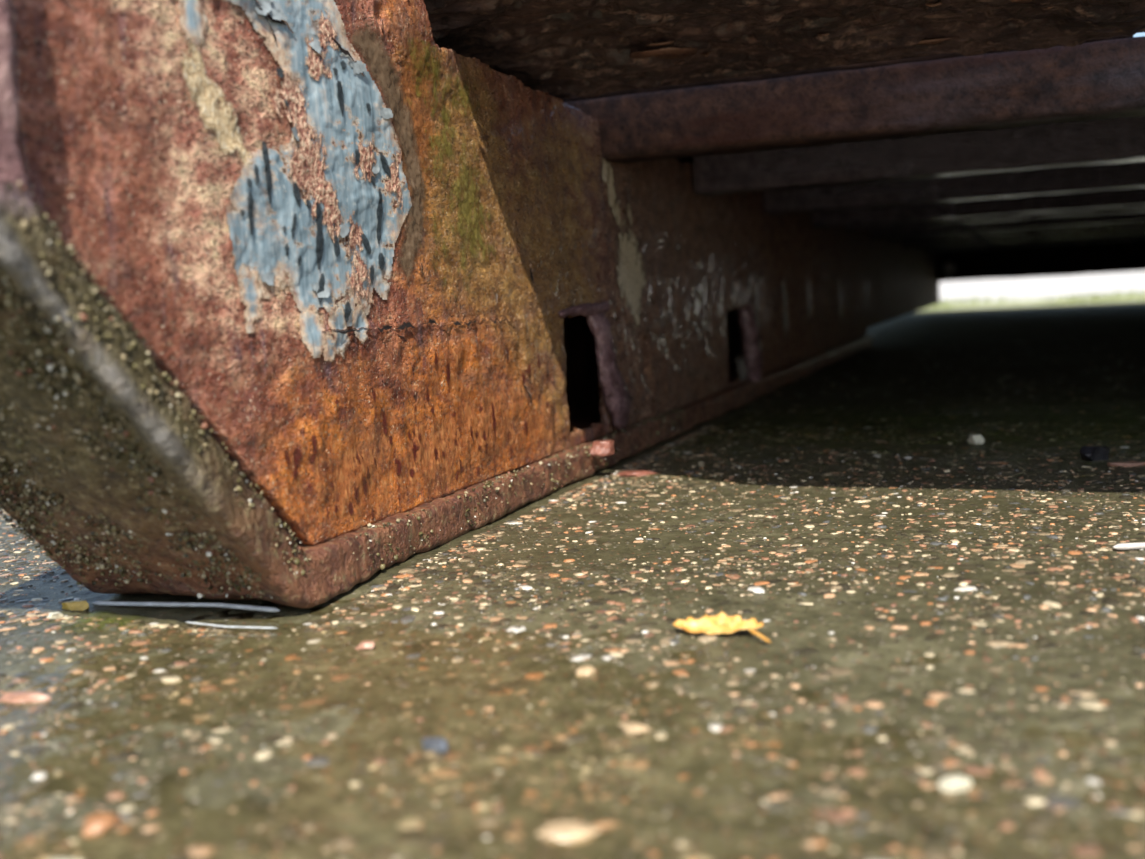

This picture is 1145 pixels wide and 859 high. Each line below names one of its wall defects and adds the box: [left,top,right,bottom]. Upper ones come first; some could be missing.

rust [630,41,712,65]
peeling [178,0,412,362]
rust [316,343,544,517]
rust [590,440,614,456]